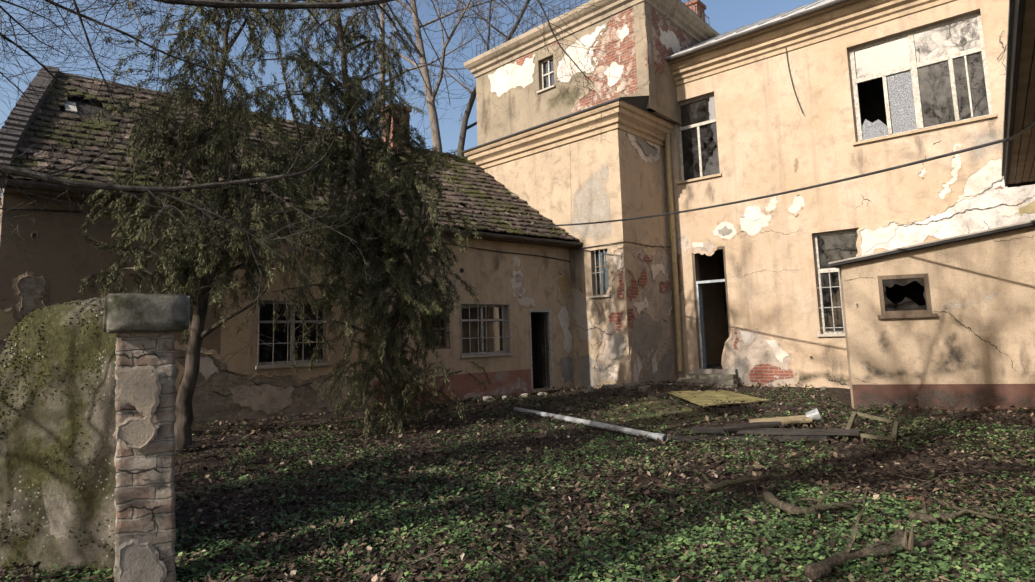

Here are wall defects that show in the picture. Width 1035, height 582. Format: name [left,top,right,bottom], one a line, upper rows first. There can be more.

flaking render [488,2,694,114]
peeling [625,132,661,166]
flaking render [856,140,1035,257]
flaking render [555,192,809,389]
crack [934,311,1016,371]
flaking render [118,368,158,447]